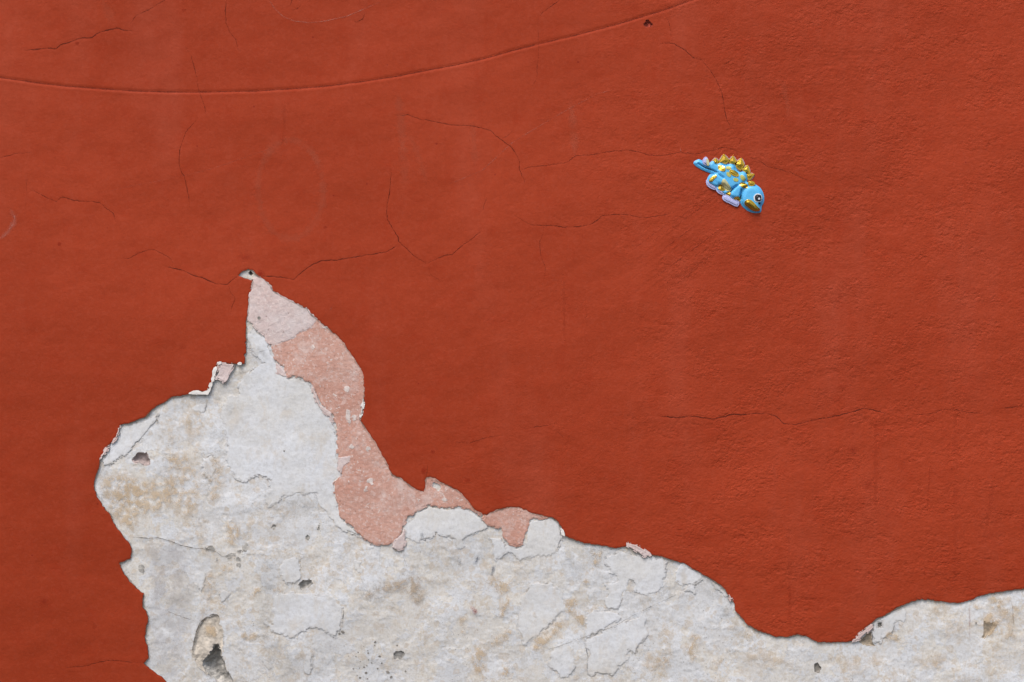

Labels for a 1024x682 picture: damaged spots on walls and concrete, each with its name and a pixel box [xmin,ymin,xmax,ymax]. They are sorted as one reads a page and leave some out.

crack [30,2,161,50]
crack [267,178,477,278]
crack [666,408,880,425]
peeling [94,269,1024,682]